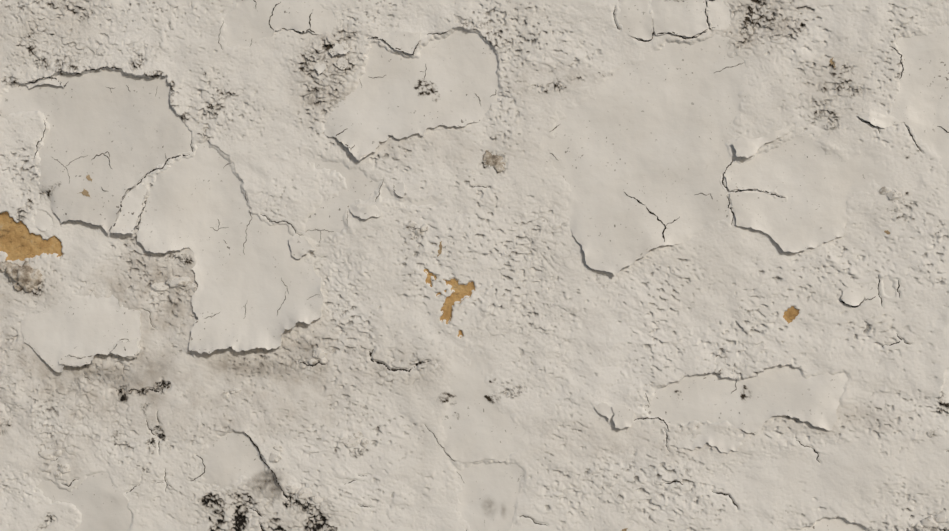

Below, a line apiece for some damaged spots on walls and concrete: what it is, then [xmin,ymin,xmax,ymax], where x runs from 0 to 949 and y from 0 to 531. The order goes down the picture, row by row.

crack [34,121,193,235]
peeling [0,29,501,354]
peeling [529,0,949,276]
crack [695,160,785,225]
peeling [21,290,141,372]
peeling [431,330,544,531]
peeling [595,365,848,453]
mould [198,493,257,531]
mould [283,494,337,531]